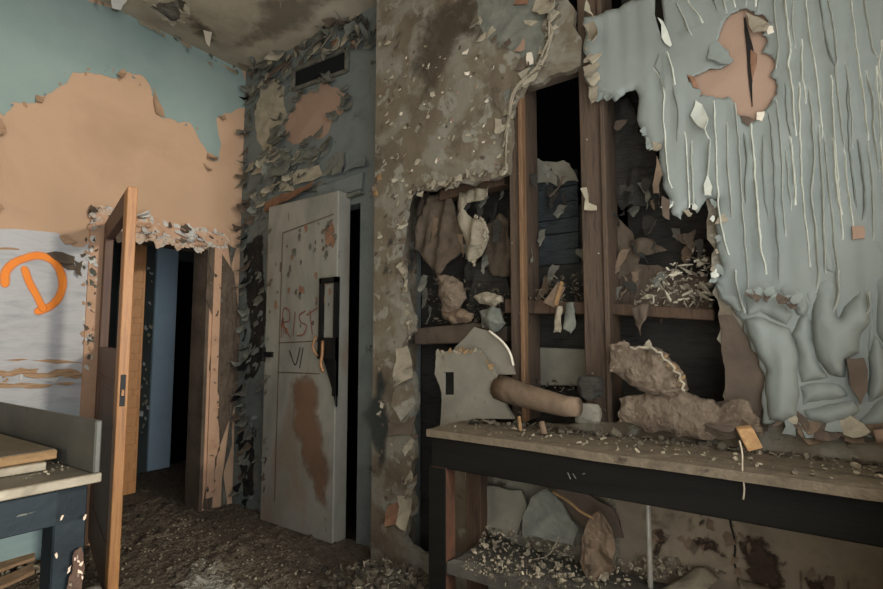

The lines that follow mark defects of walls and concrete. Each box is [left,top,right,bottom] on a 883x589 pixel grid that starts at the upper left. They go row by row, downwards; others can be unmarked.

peeling [0,0,391,510]
peeling [371,153,418,531]
peeling [468,0,562,170]
peeling [582,0,883,448]
crack [744,17,757,107]